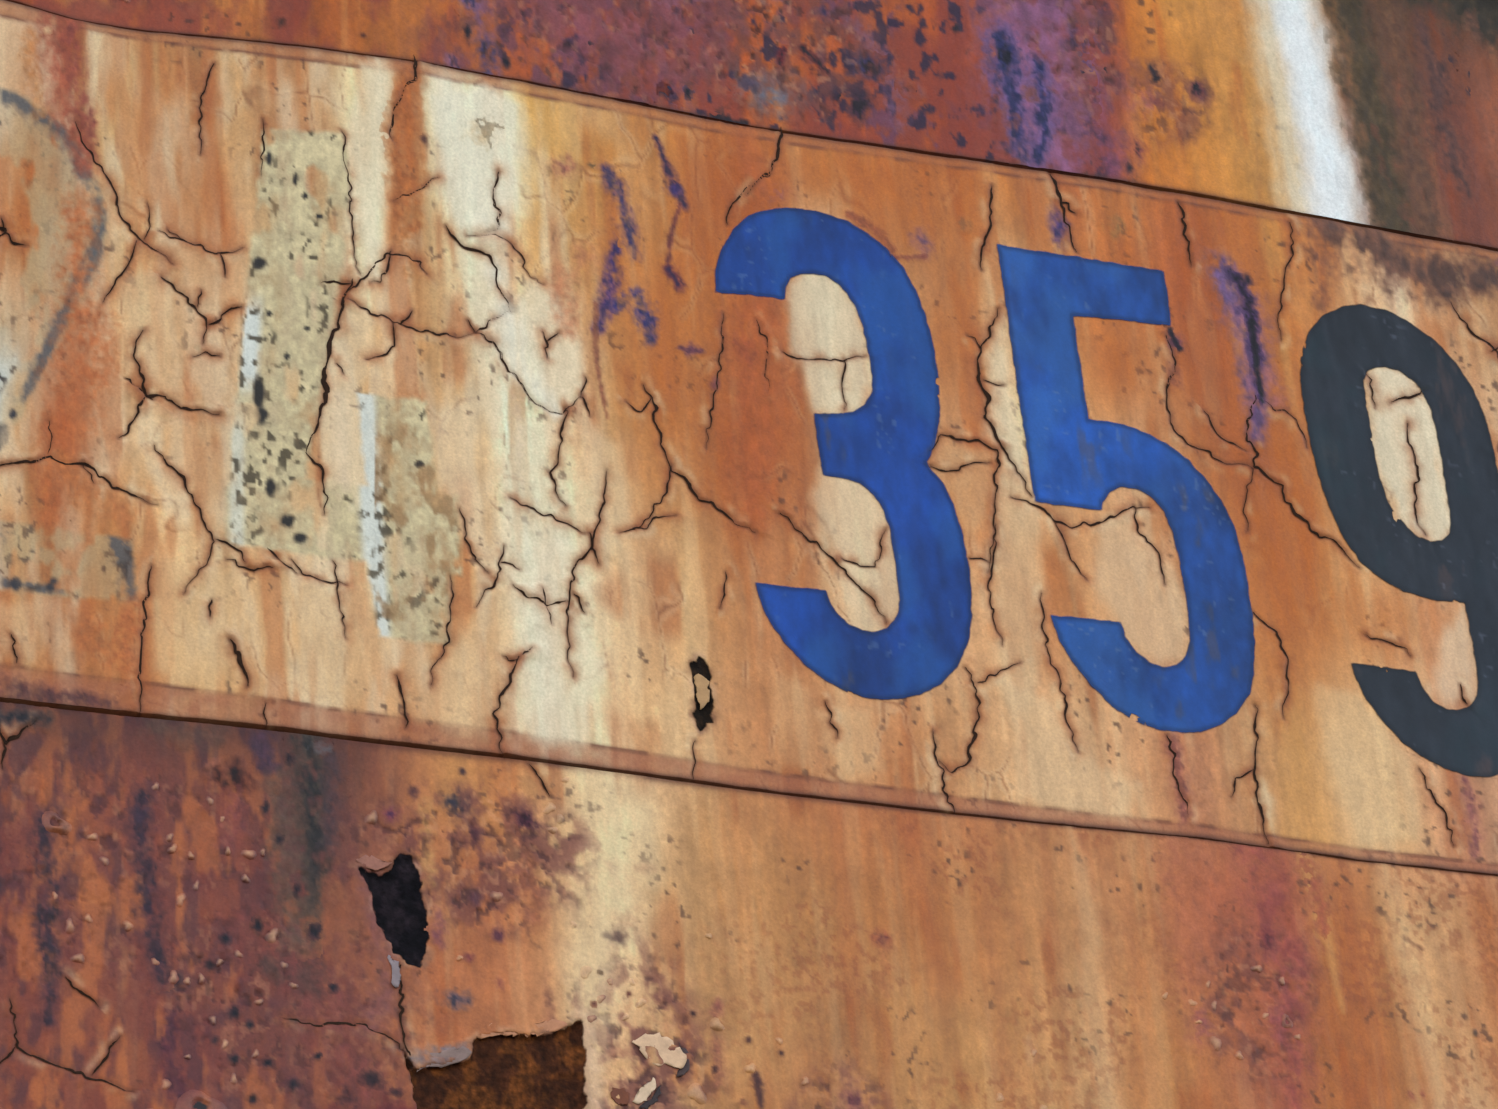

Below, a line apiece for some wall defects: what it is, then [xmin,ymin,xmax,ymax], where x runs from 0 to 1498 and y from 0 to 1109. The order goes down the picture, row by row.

crack [75,122,239,357]
crack [0,330,346,726]
crack [305,129,887,796]
rust [379,0,929,284]
rust [529,130,812,542]
peeling [690,656,714,731]
crack [931,309,1165,814]
rust [936,0,1218,183]
rust [114,750,473,1109]
peeling [356,853,429,988]
peeling [404,1019,587,1109]
rust [1134,730,1339,1109]